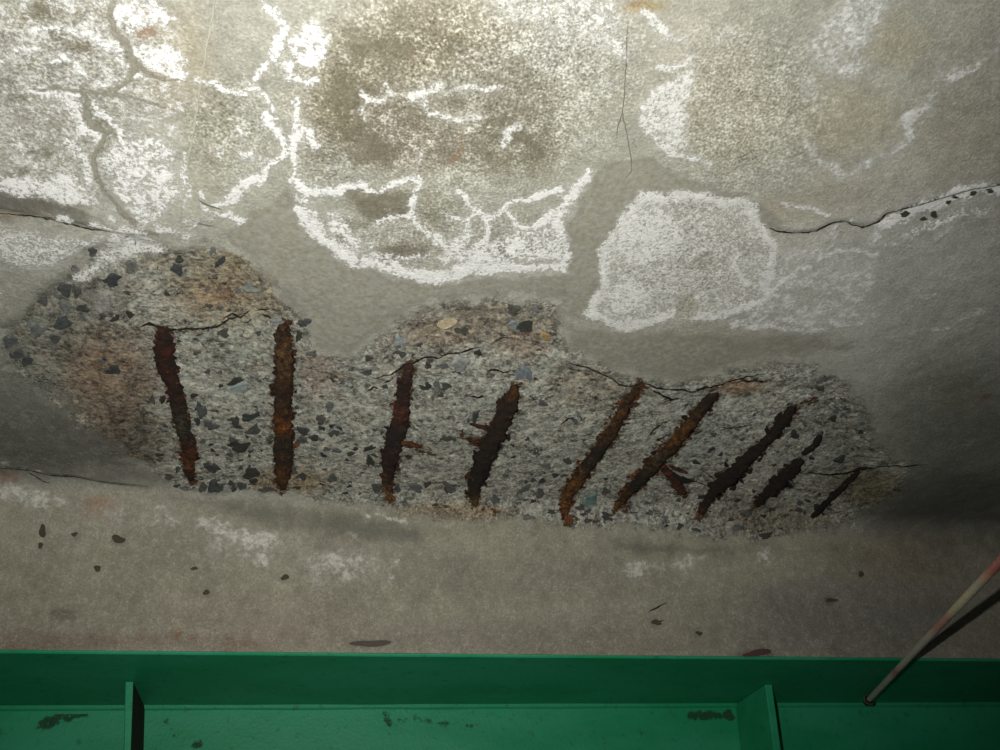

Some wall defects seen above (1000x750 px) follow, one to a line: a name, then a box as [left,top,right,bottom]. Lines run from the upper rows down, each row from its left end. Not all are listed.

crack [0,0,180,236]
water stain [0,0,1000,375]
crack [761,207,910,233]
corrosion [381,439,437,506]
spalling [0,233,912,544]
corrosion [558,377,649,527]
corrosion [610,389,720,522]
corrosion [736,397,819,462]